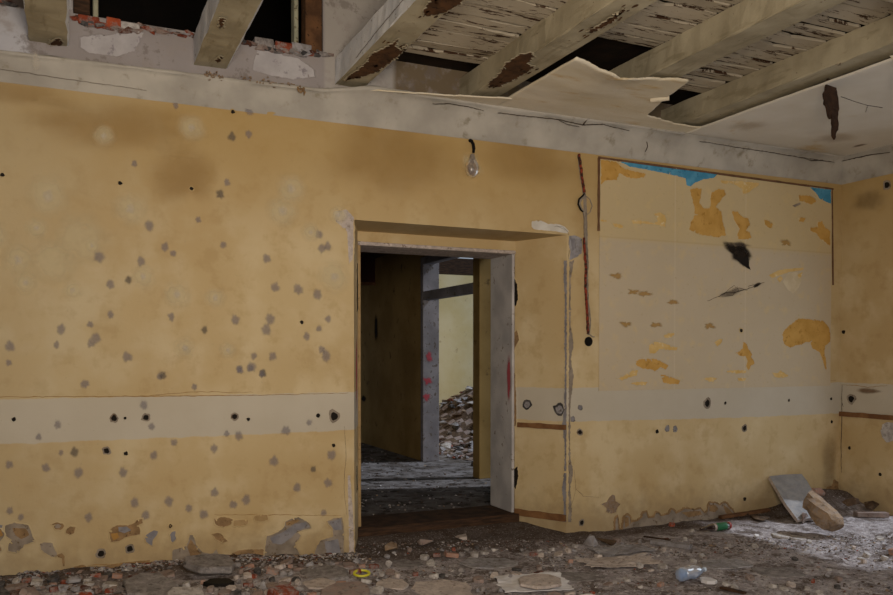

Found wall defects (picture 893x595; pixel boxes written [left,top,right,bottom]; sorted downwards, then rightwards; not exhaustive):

peeling [418,0,464,18]
peeling [344,38,408,81]
peeling [487,51,539,88]
crack [433,103,629,131]
peeling [600,159,760,241]
crack [708,282,764,301]
spalling [530,153,591,526]
peeling [781,318,847,370]
spalling [600,494,735,530]
spalling [0,521,65,566]
spalling [95,513,269,560]
spalling [263,516,312,556]